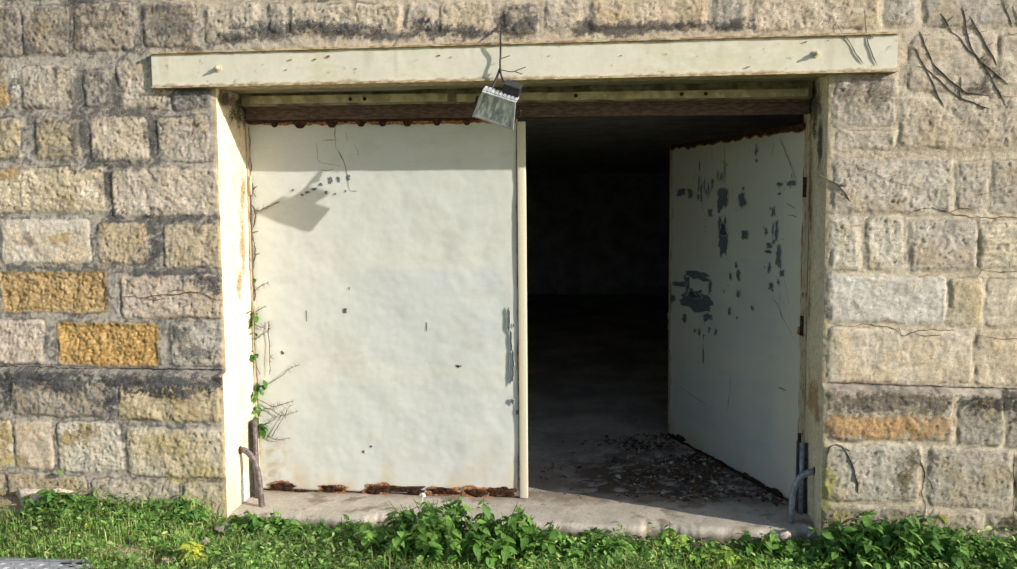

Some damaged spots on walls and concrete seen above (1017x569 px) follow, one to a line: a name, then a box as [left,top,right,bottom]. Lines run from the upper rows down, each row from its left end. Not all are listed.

water stain [216,10,542,46]
water stain [573,16,757,38]
peeling [292,175,350,196]
crack [843,162,1017,219]
crack [248,127,279,301]
peeling [667,156,747,367]
peeling [763,206,785,292]
crack [124,289,217,301]
water stain [0,326,224,420]
water stain [824,385,1017,419]
corrosion [268,480,349,493]
corrosion [361,452,520,497]